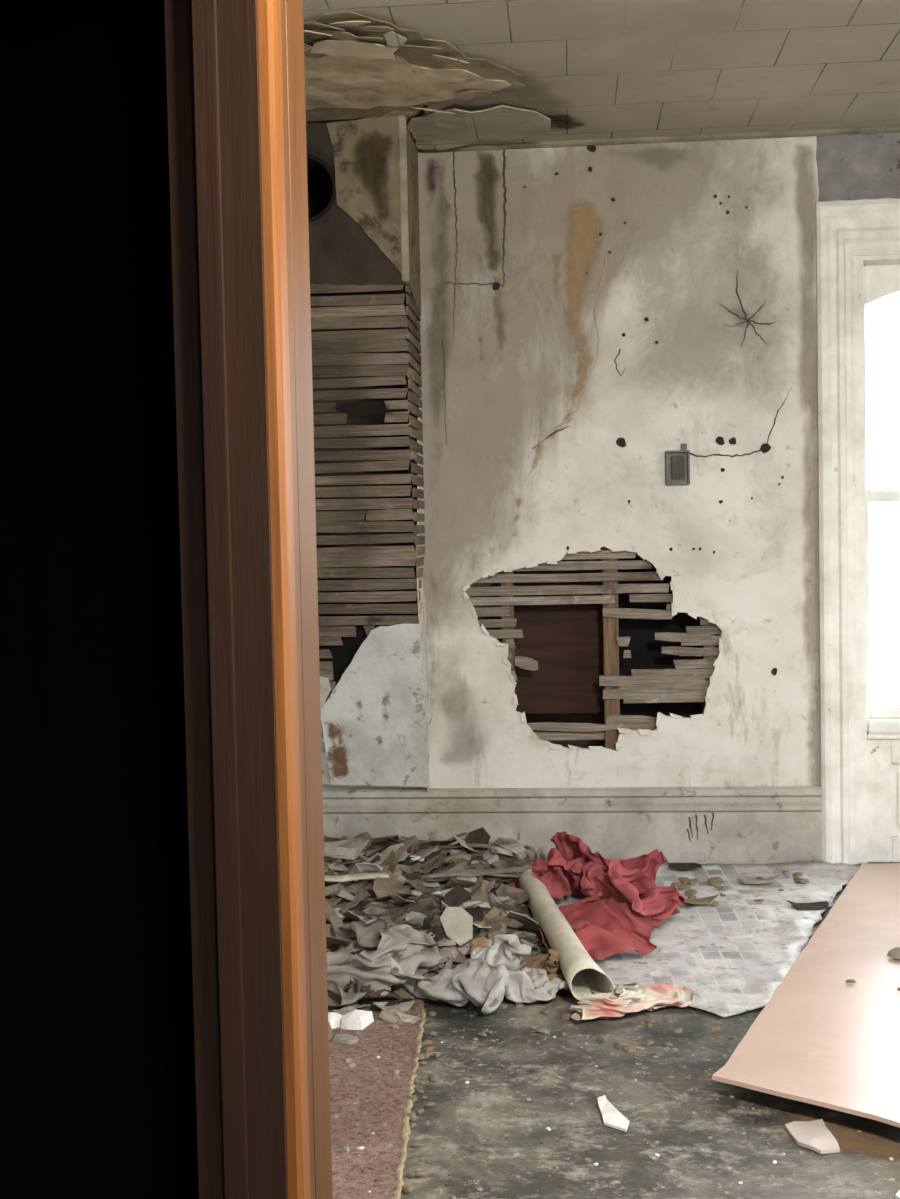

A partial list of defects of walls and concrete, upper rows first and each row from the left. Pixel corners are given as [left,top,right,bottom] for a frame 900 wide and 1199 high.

peeling [304,21,469,63]
damp [546,116,583,128]
crack [719,270,777,348]
damp [418,144,705,617]
spalling [463,546,723,751]
rust [322,723,349,777]